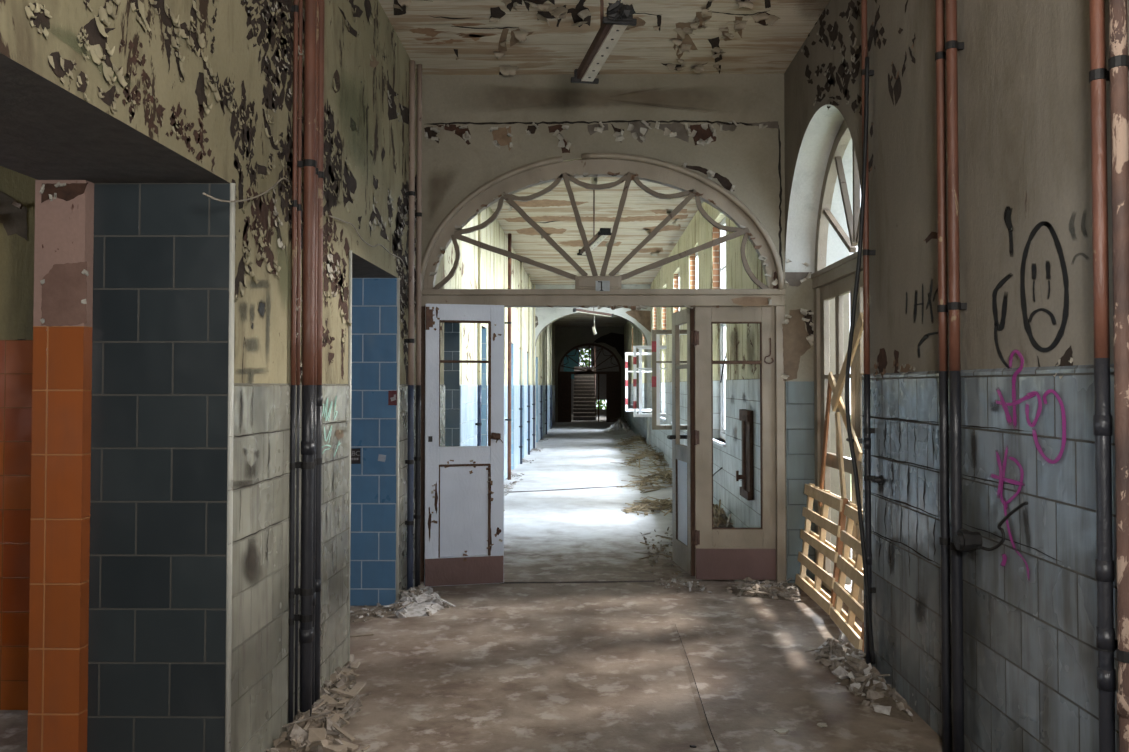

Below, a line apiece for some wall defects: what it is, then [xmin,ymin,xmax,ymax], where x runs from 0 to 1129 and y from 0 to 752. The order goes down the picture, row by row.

peeling [339,0,375,37]
peeling [393,0,411,15]
peeling [625,0,780,74]
peeling [801,0,916,137]
peeling [587,120,779,146]
peeling [0,191,28,240]
peeling [40,182,88,203]
peeling [48,0,305,345]
peeling [322,69,477,384]
peeling [428,481,438,540]
peeling [469,460,503,549]